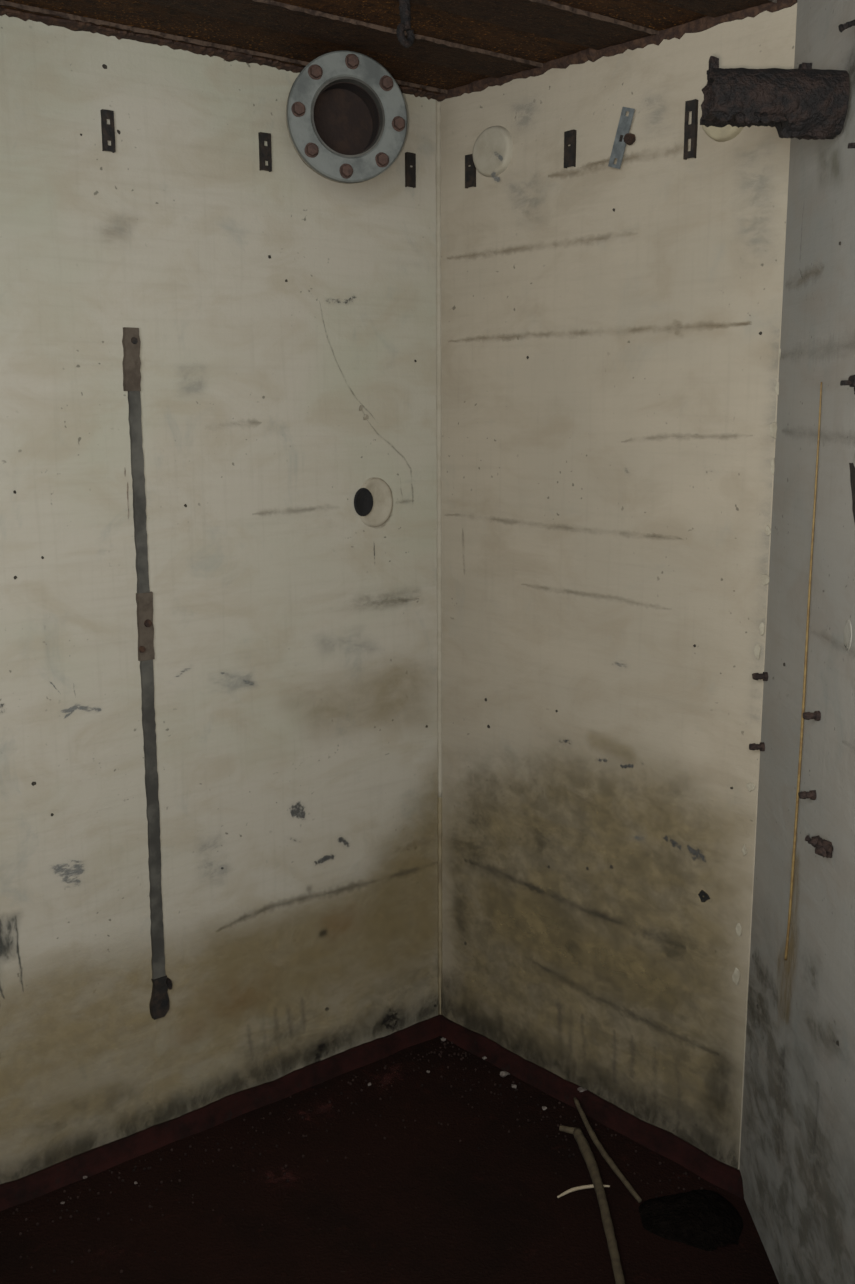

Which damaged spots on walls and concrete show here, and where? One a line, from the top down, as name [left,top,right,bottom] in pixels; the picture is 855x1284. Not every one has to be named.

corrosion [745,113,829,140]
damp [0,786,738,1181]